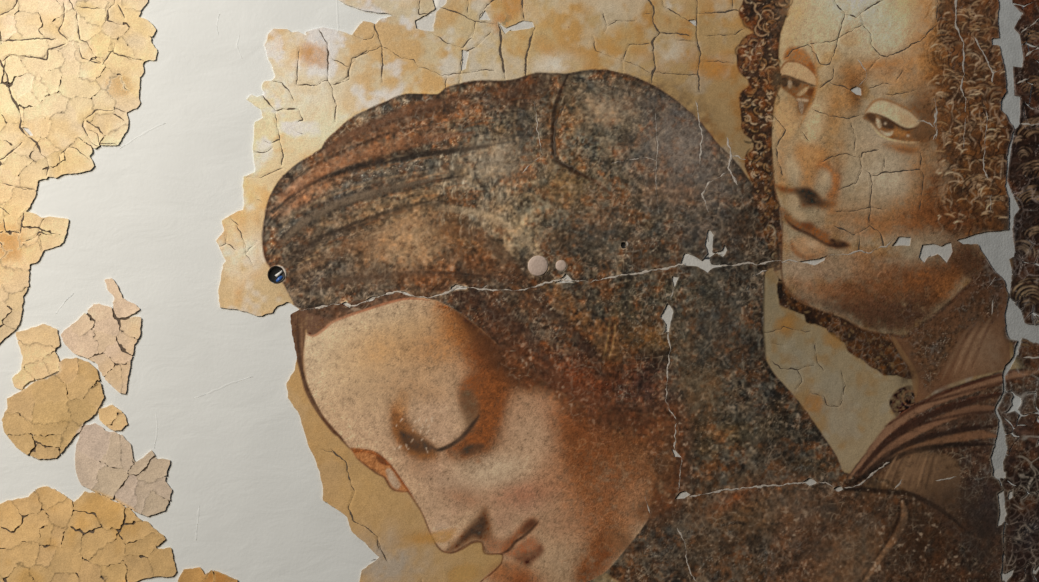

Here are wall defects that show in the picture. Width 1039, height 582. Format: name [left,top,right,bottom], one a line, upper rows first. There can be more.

crack [0,0,152,247]
crack [523,105,583,174]
crack [593,0,746,210]
crack [776,0,1039,255]
crack [8,412,83,454]
crack [63,308,138,399]
peeling [0,0,238,582]
crack [304,263,685,310]
crack [721,259,797,276]
crack [665,326,902,497]
peeling [892,0,1039,582]
crack [0,456,170,582]